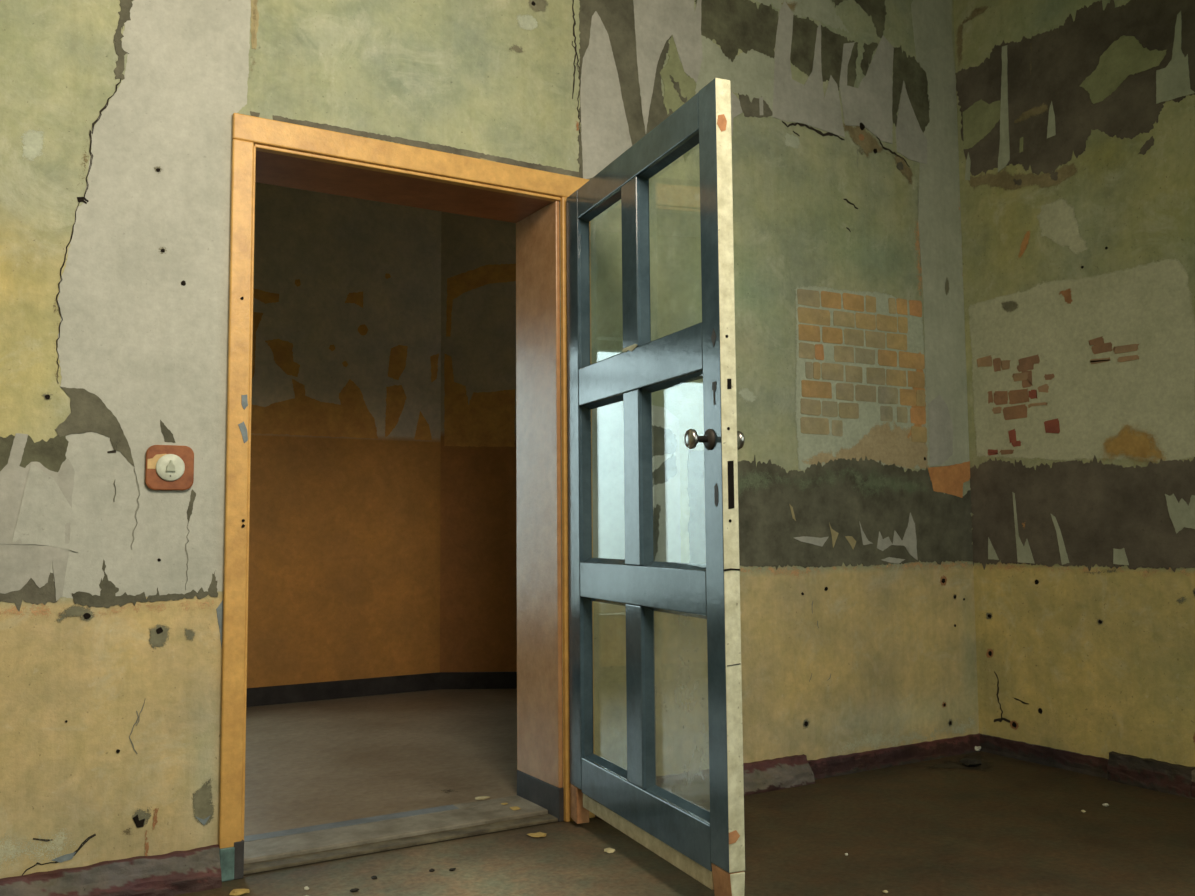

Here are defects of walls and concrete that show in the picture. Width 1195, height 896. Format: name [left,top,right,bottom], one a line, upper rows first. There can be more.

crack [53,79,121,384]
flaking render [0,0,408,649]
crack [782,121,858,163]
peeling [577,0,1195,572]
crack [994,671,1029,723]